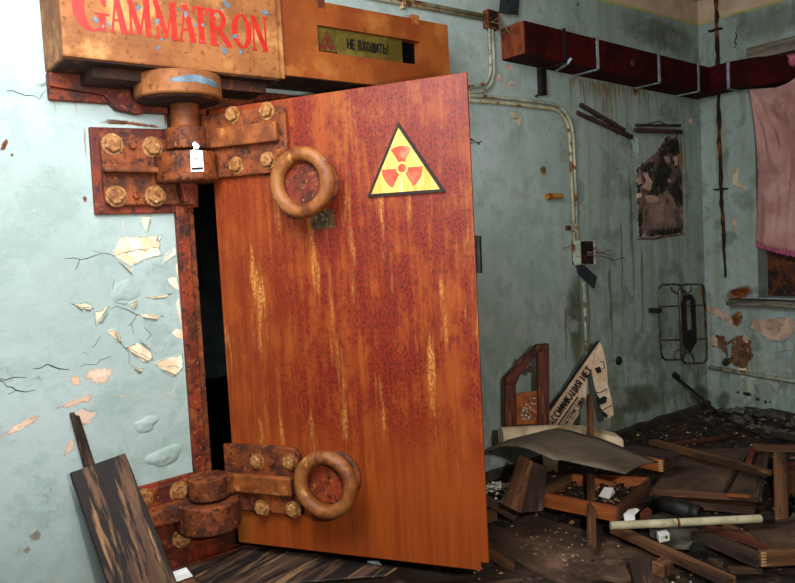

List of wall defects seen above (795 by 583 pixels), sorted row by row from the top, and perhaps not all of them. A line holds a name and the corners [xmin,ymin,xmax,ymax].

corrosion [107,120,156,128]
peeling [111,215,183,339]
peeling [70,300,110,327]
crack [84,283,151,365]
peeling [106,328,184,377]
spalling [706,306,795,377]
crack [0,364,69,394]
peeling [71,368,112,385]
peeling [61,394,98,425]
peeling [0,415,37,438]